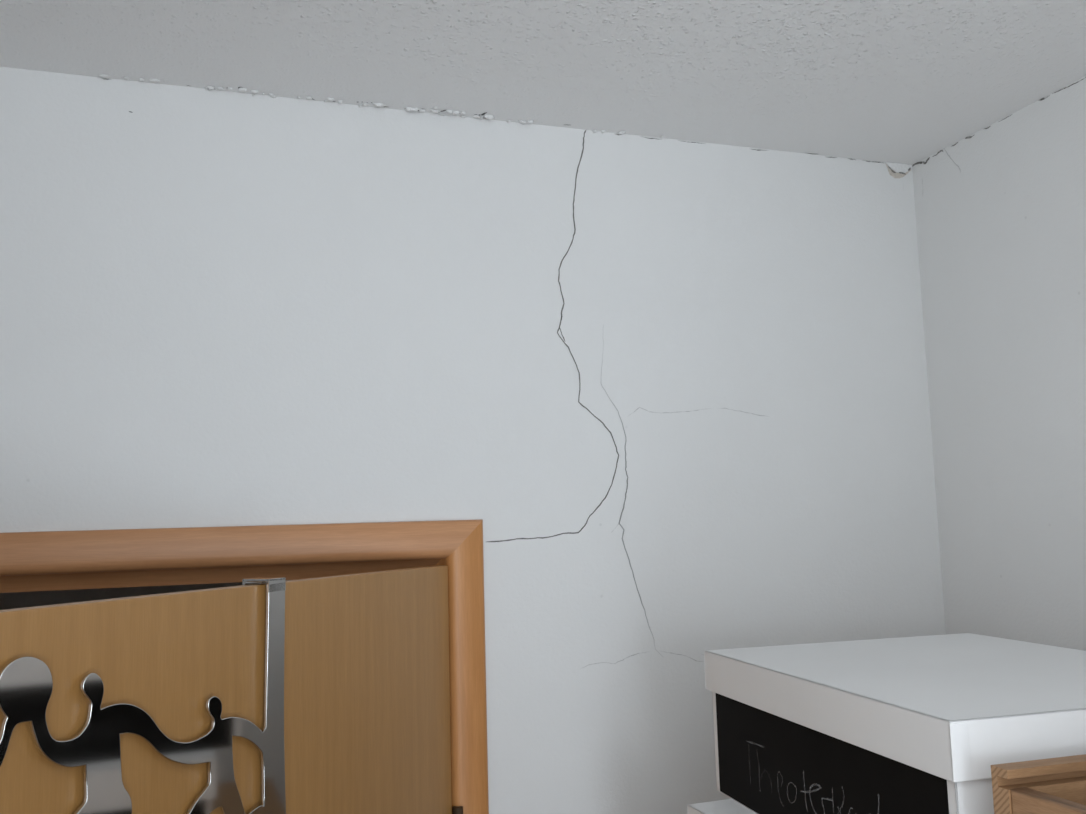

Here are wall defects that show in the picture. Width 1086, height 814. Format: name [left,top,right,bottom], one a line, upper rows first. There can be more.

crack [487,130,641,599]
crack [913,115,1011,166]